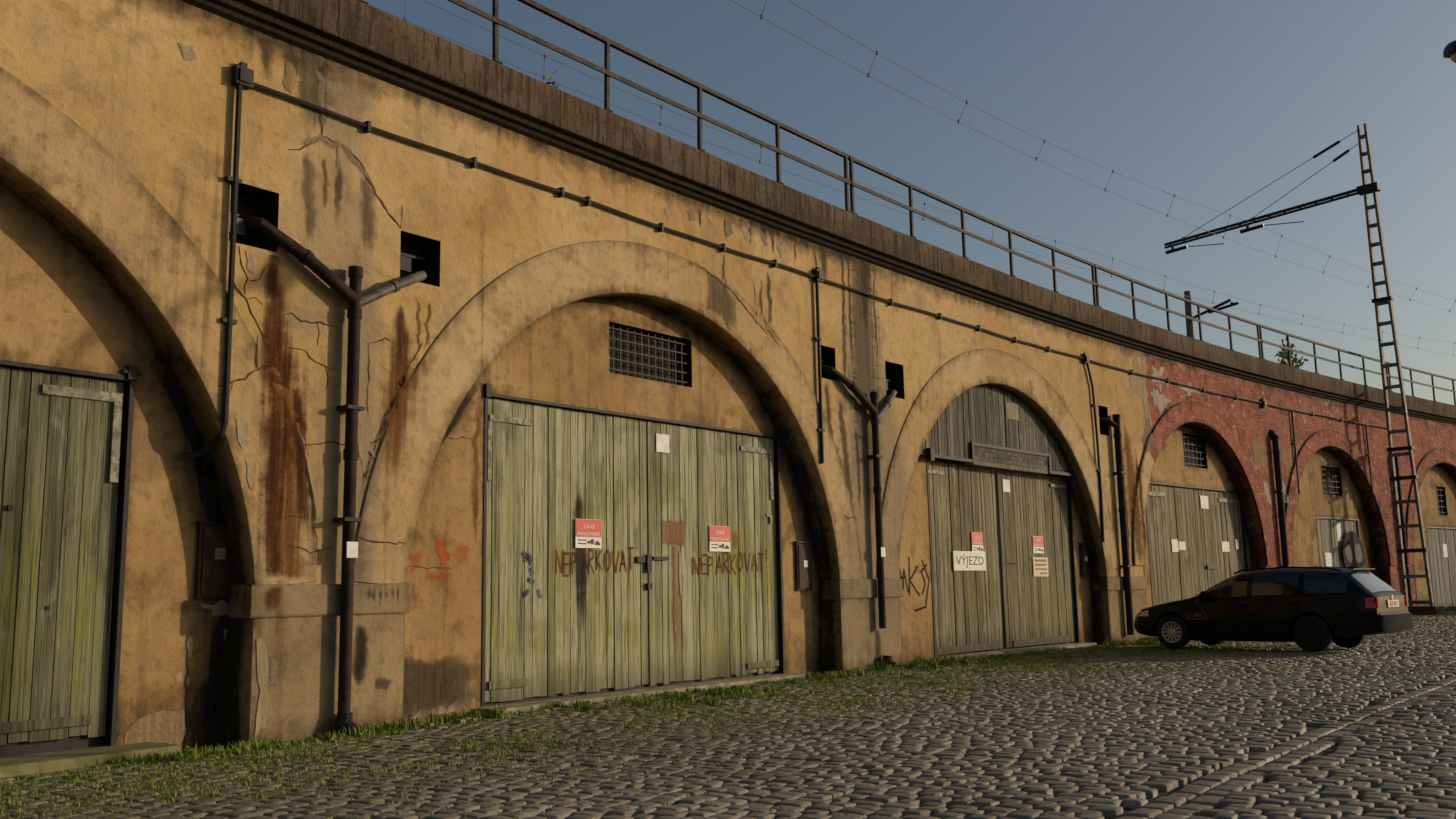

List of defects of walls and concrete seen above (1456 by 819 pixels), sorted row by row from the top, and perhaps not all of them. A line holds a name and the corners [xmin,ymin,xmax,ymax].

crack [288,0,403,228]
leakage [304,159,342,232]
leakage [363,182,374,243]
rust [264,255,308,606]
crack [218,247,456,569]
rust [387,304,431,463]
flaking render [1129,356,1201,452]
leakage [354,627,470,711]